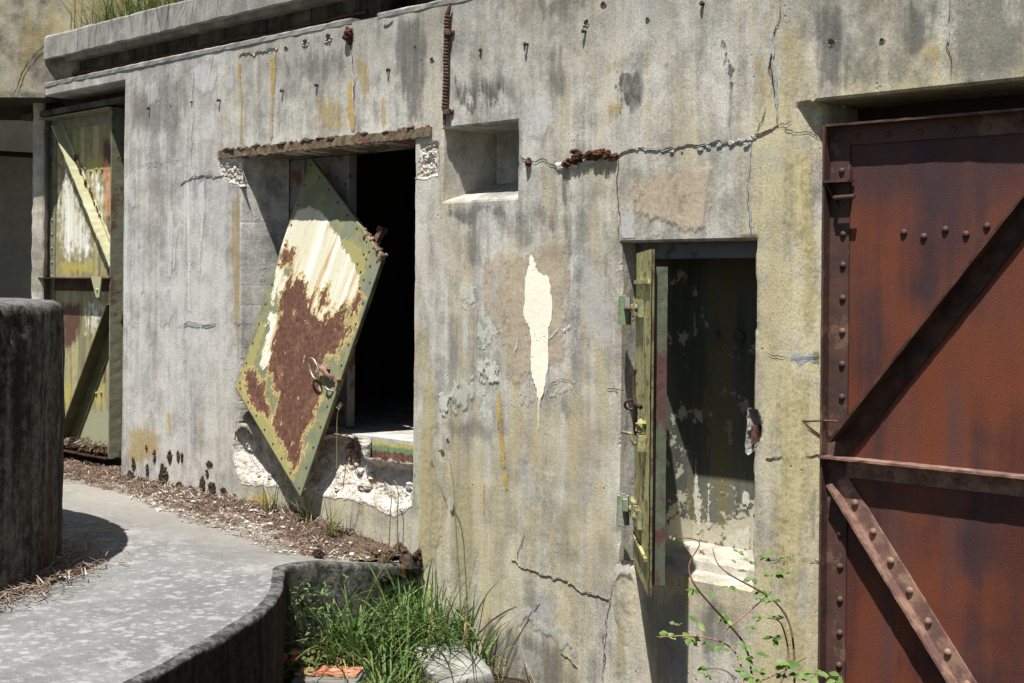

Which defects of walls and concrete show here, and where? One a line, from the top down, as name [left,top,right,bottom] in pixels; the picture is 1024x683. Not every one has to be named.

crack [139,72,227,185]
spalling [415,140,440,180]
rust [555,148,619,171]
water stain [615,71,642,113]
crack [616,4,821,238]
flaking render [439,238,574,430]
spalling [232,420,293,487]
spalling [128,433,423,585]
peeling [694,351,725,533]
spalling [737,399,764,455]
crack [513,532,614,683]